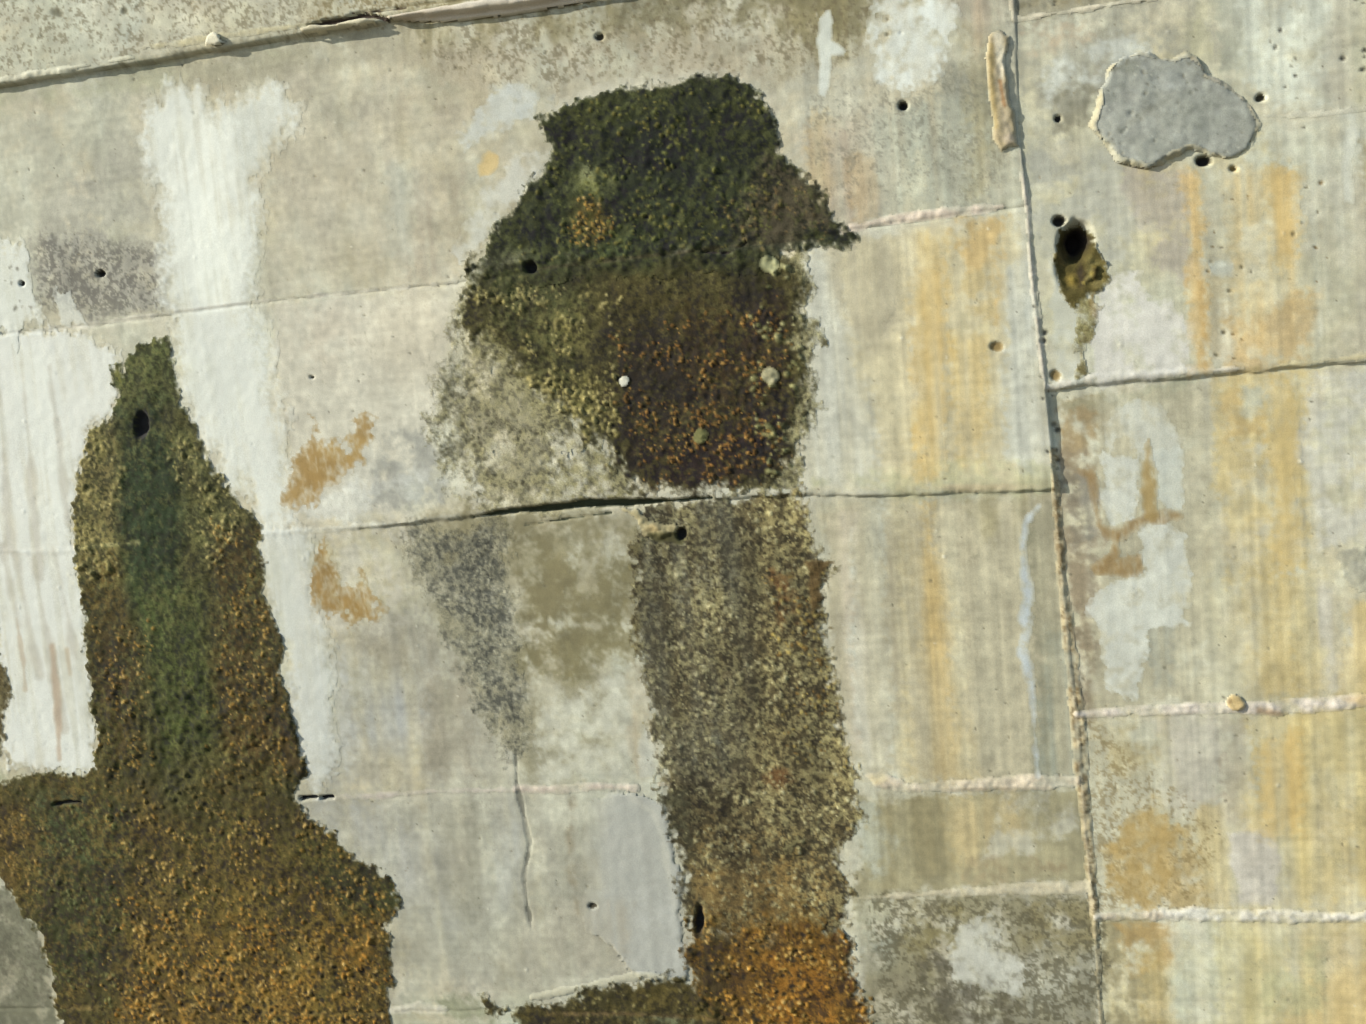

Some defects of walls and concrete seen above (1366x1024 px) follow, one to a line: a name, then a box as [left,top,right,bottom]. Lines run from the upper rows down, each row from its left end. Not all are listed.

crack [309,0,478,25]
water stain [454,66,743,154]
spalling [1088,50,1261,168]
water stain [450,147,552,265]
water stain [0,235,124,782]
water stain [134,72,344,803]
corrosion [279,410,379,513]
corrosion [307,535,390,629]
crack [474,495,713,526]
spalling [1336,546,1366,592]
crack [514,753,532,927]
water stain [0,886,61,1024]